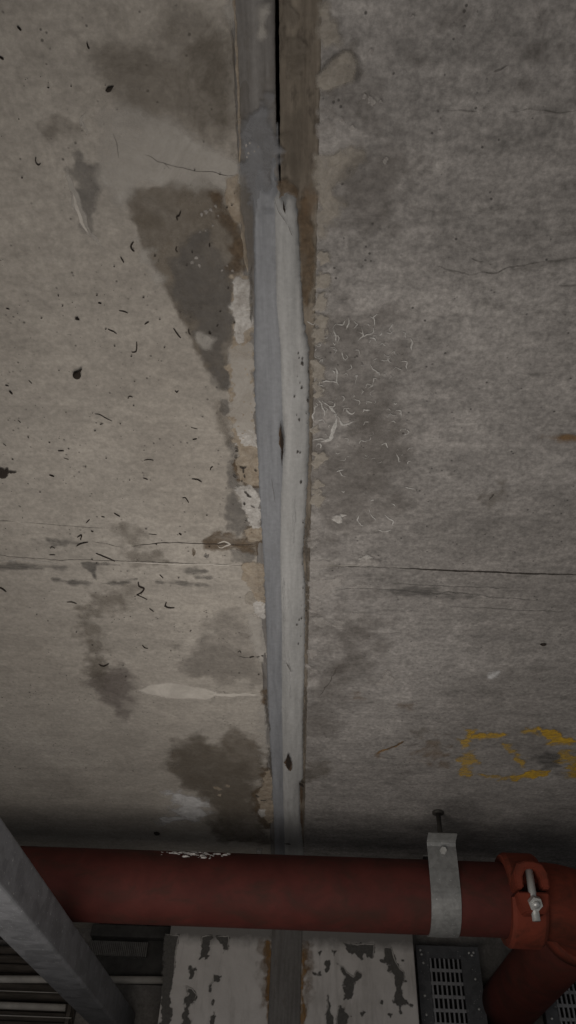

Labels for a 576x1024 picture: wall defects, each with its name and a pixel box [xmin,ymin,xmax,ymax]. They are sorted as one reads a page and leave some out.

damp [100,0,283,447]
damp [310,314,413,476]
damp [139,683,274,859]
peeling [159,934,230,1024]
peeling [312,942,413,1024]